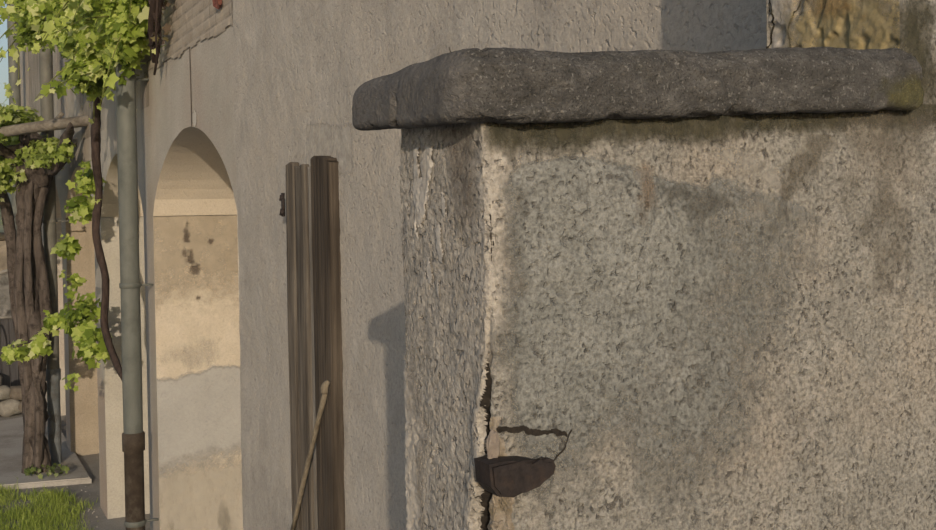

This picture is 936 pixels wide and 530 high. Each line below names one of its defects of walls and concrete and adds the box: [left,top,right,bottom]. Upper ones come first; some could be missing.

crack [766,0,801,49]
water stain [153,215,238,292]
crack [487,204,495,261]
crack [480,352,572,461]
water stain [159,464,243,530]
crack [479,490,493,530]